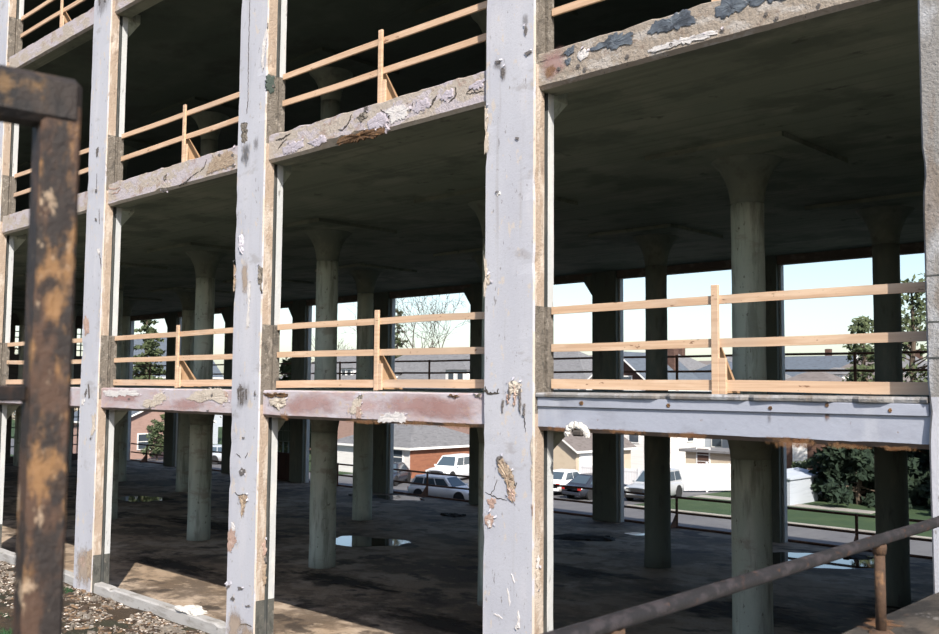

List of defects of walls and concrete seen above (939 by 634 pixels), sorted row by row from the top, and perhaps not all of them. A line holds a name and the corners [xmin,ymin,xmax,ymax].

peeling [564,32,633,66]
peeling [647,0,786,53]
spalling [281,88,454,155]
peeling [378,411,408,424]
spalling [501,377,526,416]
spalling [483,453,517,528]
peeling [227,492,249,553]